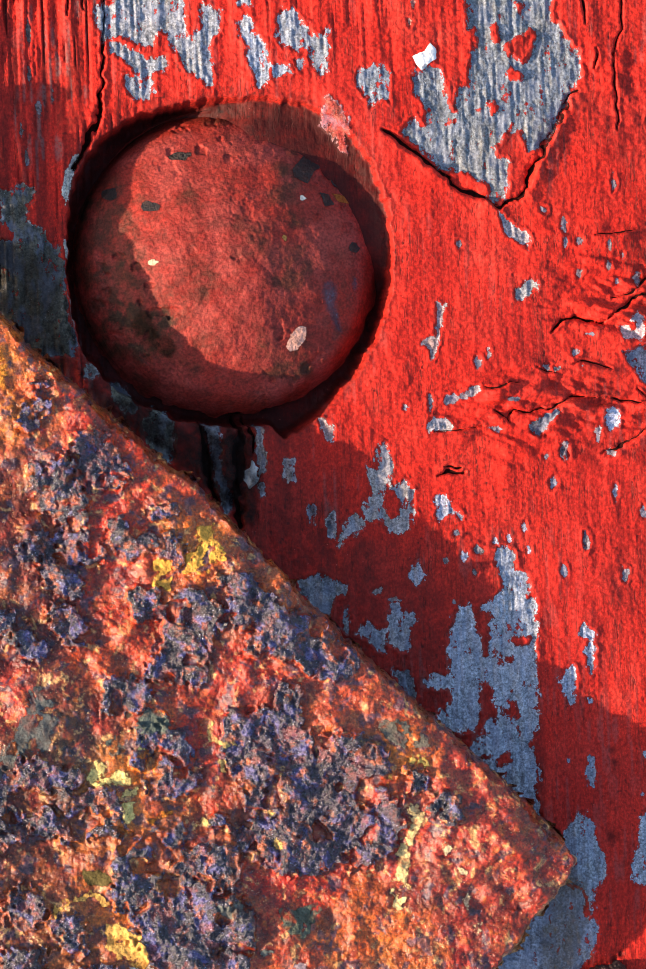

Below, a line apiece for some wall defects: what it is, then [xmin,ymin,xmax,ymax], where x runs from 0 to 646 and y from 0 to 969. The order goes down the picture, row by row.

peeling [92,0,223,101]
peeling [235,0,332,89]
crack [382,90,579,209]
peeling [402,0,581,245]
crack [552,277,646,331]
peeling [306,442,416,549]
corrosion [152,523,227,591]
peeling [391,534,543,815]
corrosion [207,721,237,773]
corrosion [86,760,139,824]
corrosion [53,890,110,919]
corrosion [105,923,149,969]